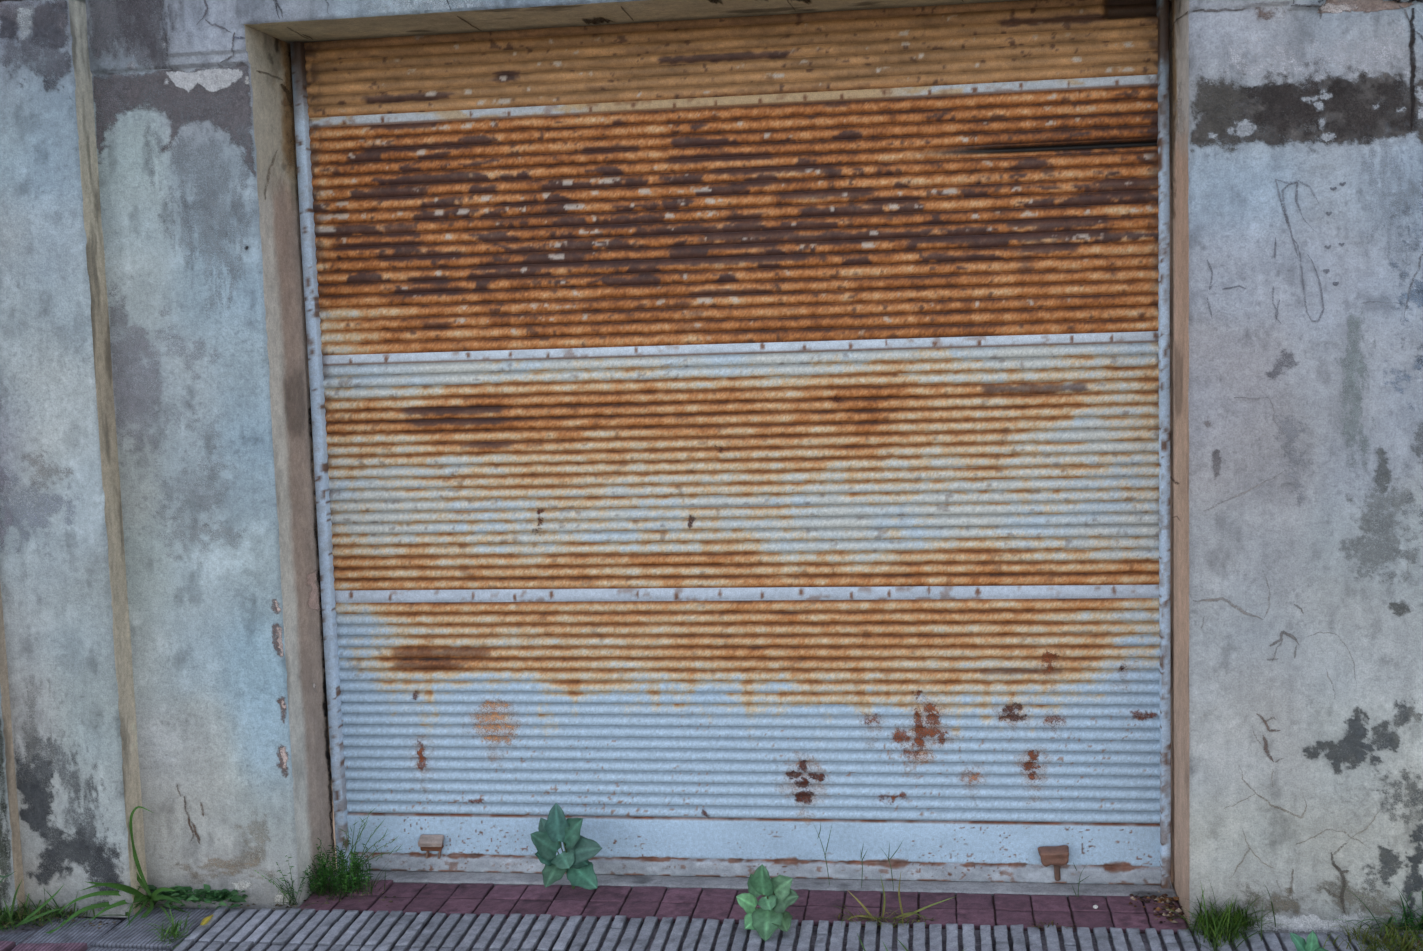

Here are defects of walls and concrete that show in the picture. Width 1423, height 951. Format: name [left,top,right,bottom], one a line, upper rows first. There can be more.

crack [1173,8,1247,24]
crack [1291,0,1322,19]
spalling [1317,0,1423,16]
crack [1400,0,1423,130]
leakage [1191,67,1423,217]
leakage [1342,311,1423,582]
corrosion [893,690,947,761]
corrosion [999,703,1027,723]
leakage [0,691,122,921]
corrosion [786,760,825,804]
corrosion [1024,750,1041,780]
leakage [1303,700,1423,918]